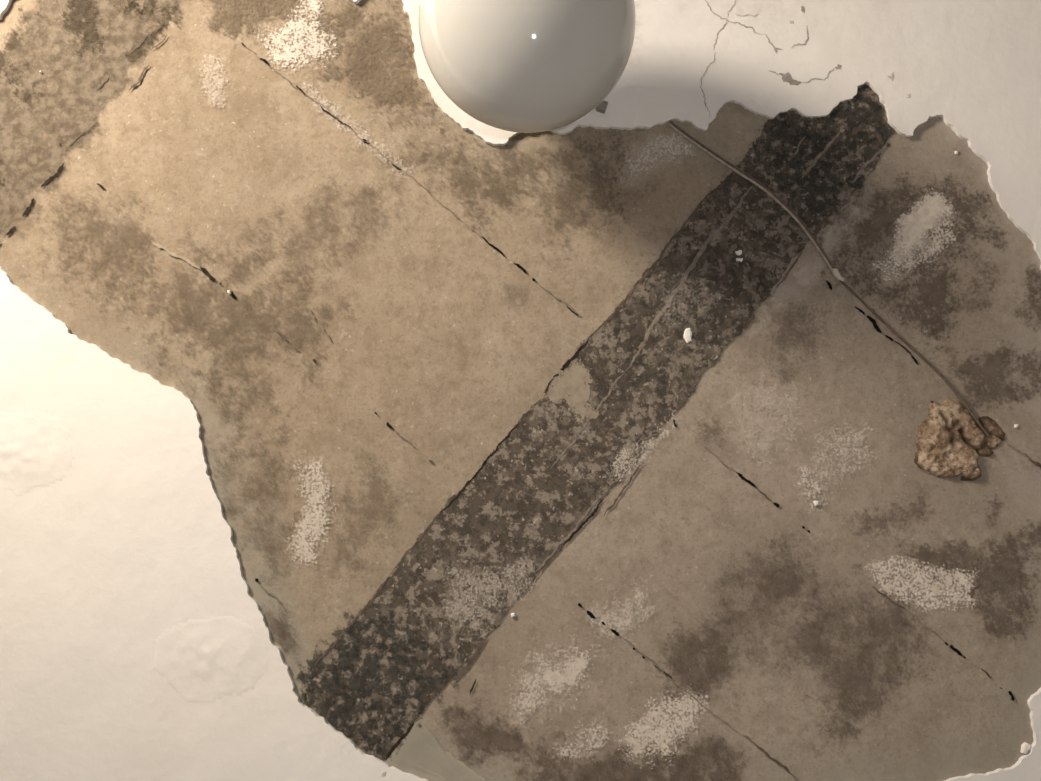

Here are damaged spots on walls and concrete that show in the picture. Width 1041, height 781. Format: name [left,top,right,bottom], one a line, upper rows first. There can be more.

damp [63,0,104,53]
damp [114,0,182,62]
damp [208,0,442,132]
crack [700,0,809,117]
crack [241,43,581,317]
damp [749,89,1041,408]
damp [243,451,336,566]
flaking render [0,0,810,763]
flaking render [386,85,1041,781]
damp [297,603,743,781]
crack [578,603,798,781]
damp [800,523,1041,734]